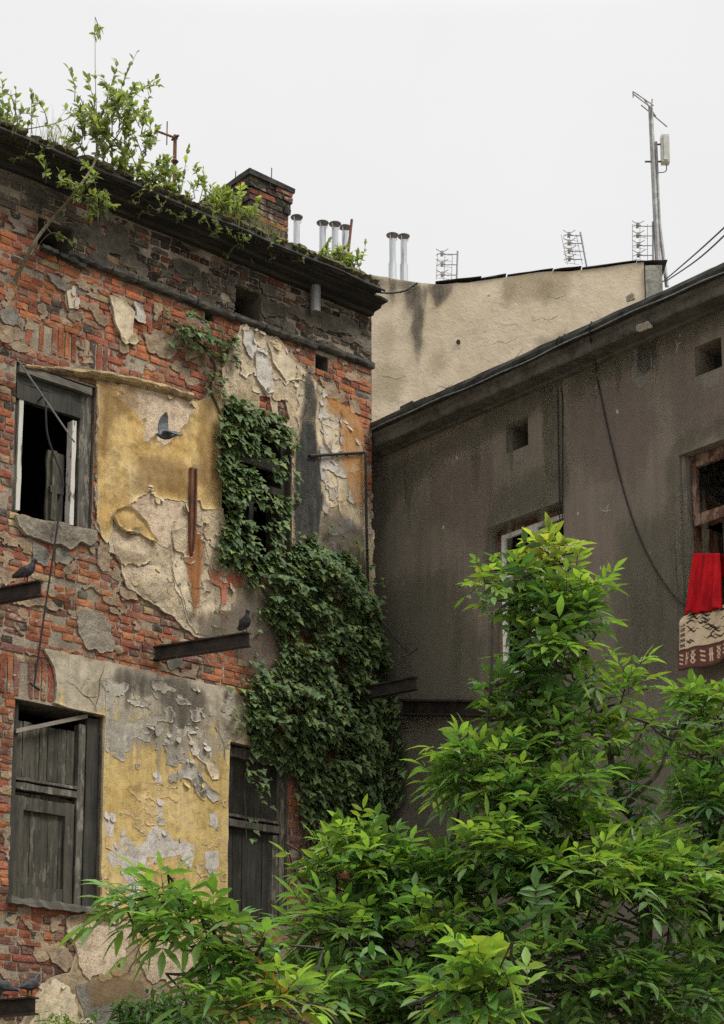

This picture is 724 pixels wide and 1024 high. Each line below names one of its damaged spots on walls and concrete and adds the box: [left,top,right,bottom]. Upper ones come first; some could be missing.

damp [372,275,452,348]
spalling [0,244,374,551]
damp [294,369,364,591]
peeling [131,483,243,634]
corrosion [187,532,203,610]
spalling [0,526,247,1024]
damp [105,669,216,765]